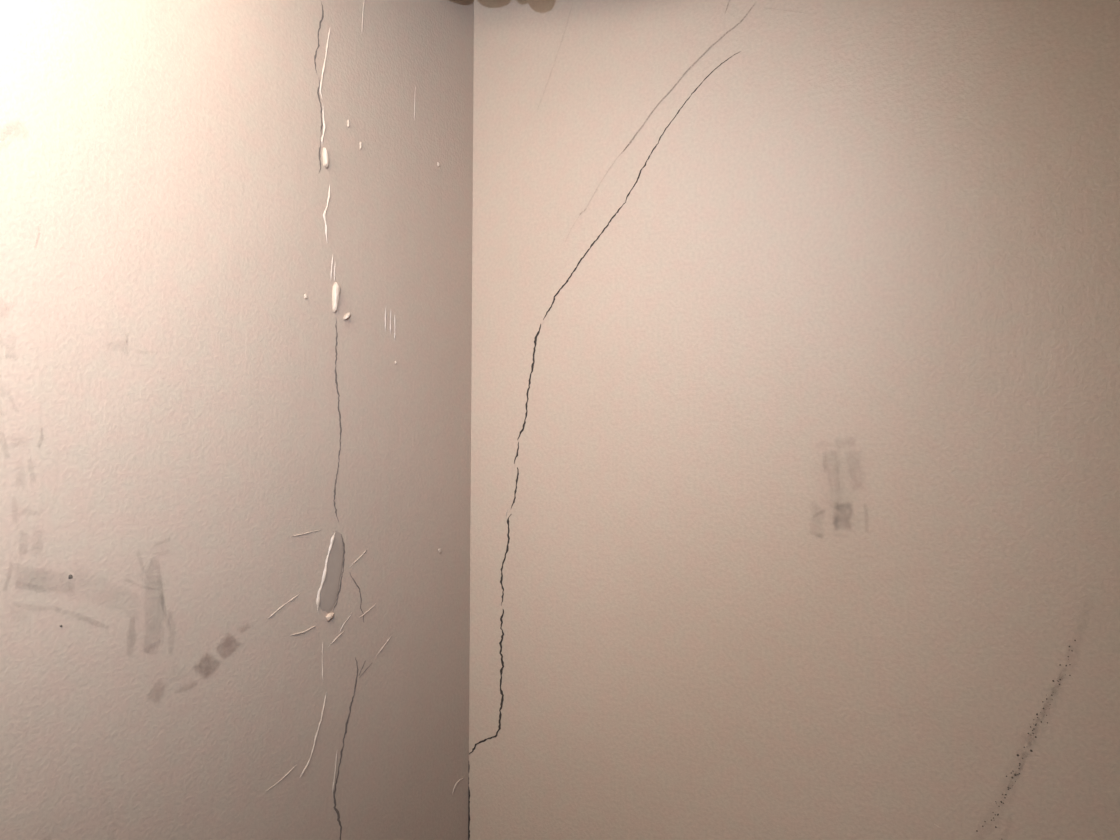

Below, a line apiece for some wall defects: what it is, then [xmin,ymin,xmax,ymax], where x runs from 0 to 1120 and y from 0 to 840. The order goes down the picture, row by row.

crack [314,2,336,281]
peeling [319,530,344,613]
crack [316,320,364,622]
crack [468,51,741,840]
crack [332,657,372,840]